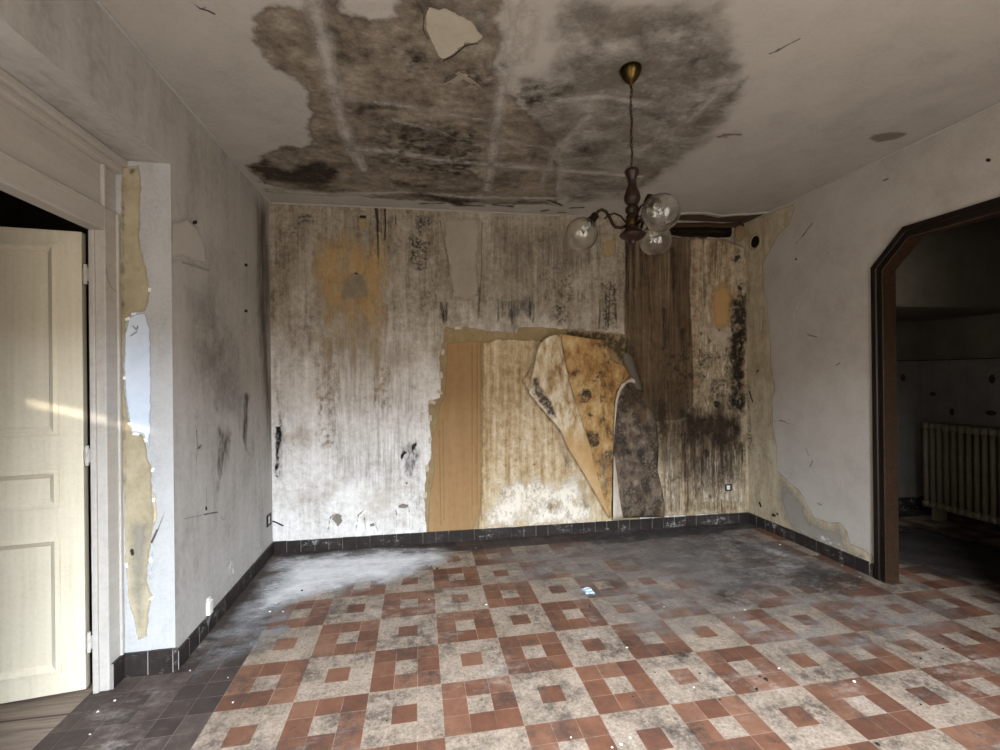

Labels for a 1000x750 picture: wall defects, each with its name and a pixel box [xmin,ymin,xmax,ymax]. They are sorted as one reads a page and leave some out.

flaking render [417,4,483,62]
water stain [247,0,736,205]
flaking render [121,165,157,640]
water stain [314,234,387,413]
water stain [401,443,418,484]
mould [410,218,433,270]
peeling [423,326,643,532]
mould [532,378,556,417]
mould [586,432,599,446]
water stain [599,237,749,516]
flaking render [669,205,873,563]